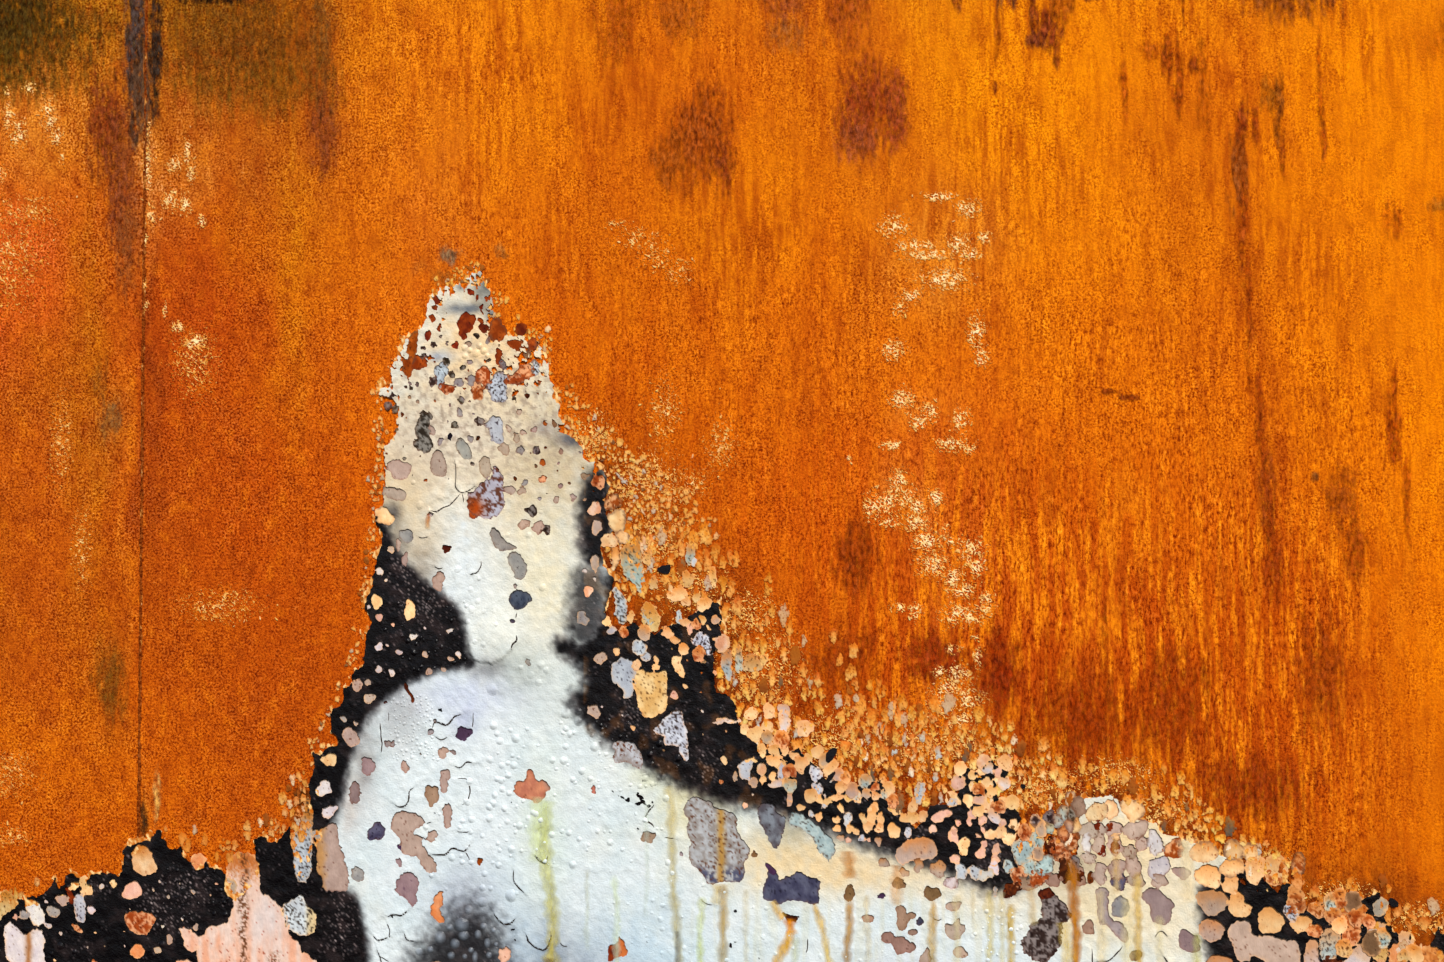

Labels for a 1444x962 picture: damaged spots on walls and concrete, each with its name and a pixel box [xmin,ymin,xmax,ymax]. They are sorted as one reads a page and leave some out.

rust [994,0,1087,68]
rust [1144,33,1209,117]
peeling [0,81,78,336]
peeling [140,115,207,249]
peeling [602,217,699,293]
rust [650,82,733,193]
peeling [872,189,996,370]
rust [1232,77,1285,344]
rust [1386,369,1411,537]
rust [908,629,1020,708]
rust [772,902,794,962]
rust [814,905,852,962]